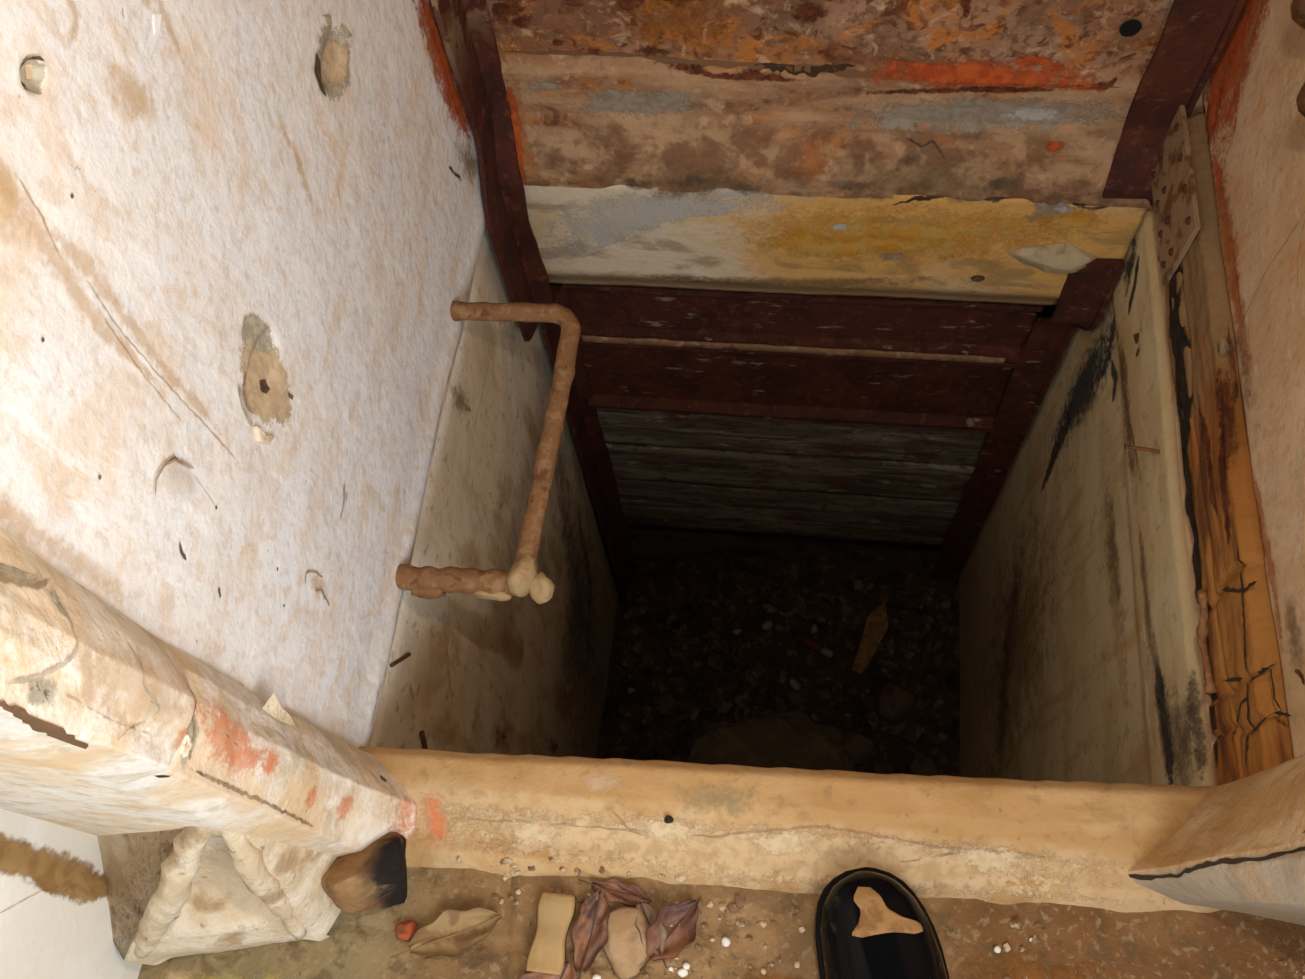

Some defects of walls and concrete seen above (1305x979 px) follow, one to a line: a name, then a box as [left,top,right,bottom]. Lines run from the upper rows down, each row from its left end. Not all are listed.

spalling [20,56,47,94]
spalling [315,14,352,101]
corrosion [412,0,475,180]
corrosion [615,0,799,82]
corrosion [866,55,1096,94]
corrosion [1199,0,1267,544]
spalling [239,314,294,444]
spalling [0,563,50,589]
leakage [1106,503,1124,685]
crack [1158,251,1292,772]
leakage [1142,641,1206,786]
crack [1129,830,1305,880]